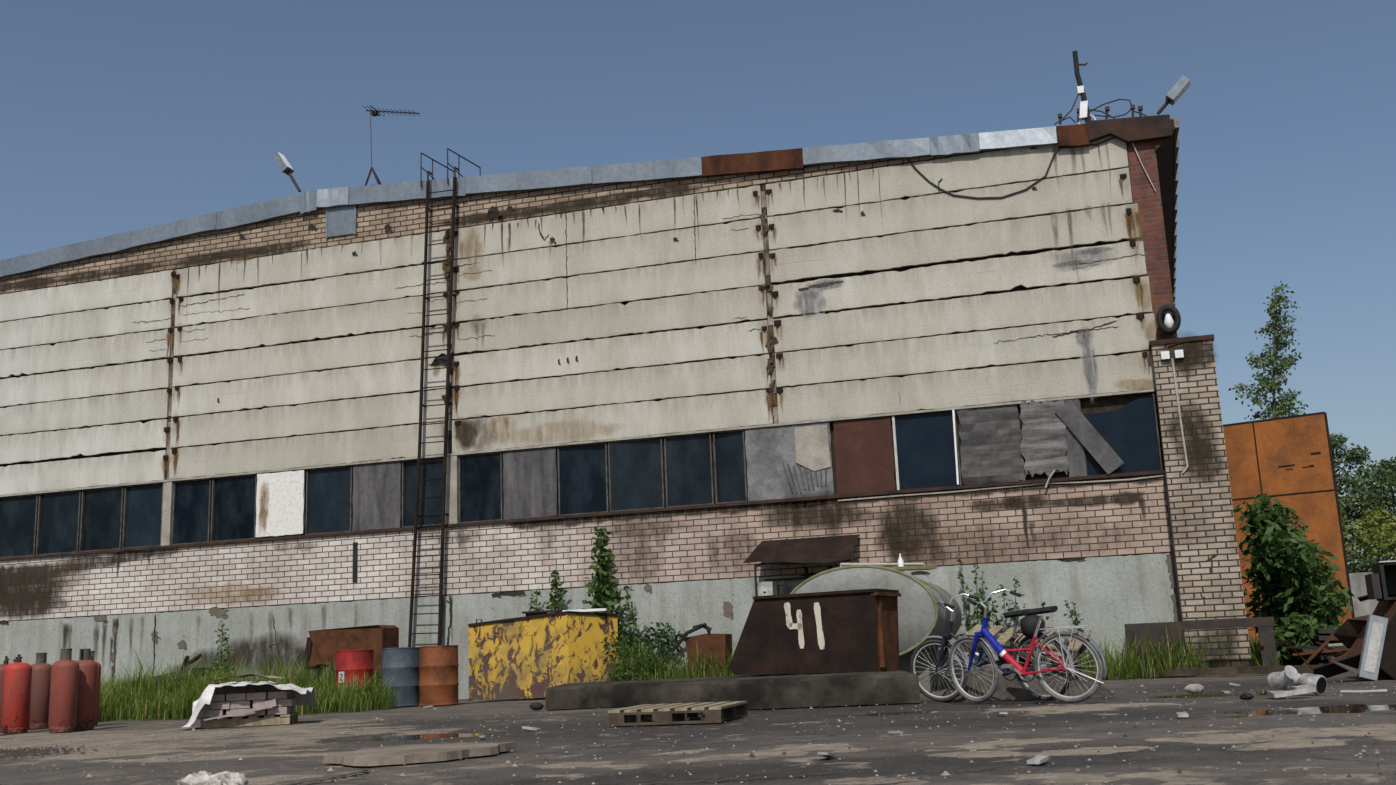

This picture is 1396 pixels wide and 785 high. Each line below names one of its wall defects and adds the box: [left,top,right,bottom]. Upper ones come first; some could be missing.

peeling [798,280,843,313]
leakage [1170,410,1222,480]
leakage [511,475,1160,554]
leakage [0,549,176,617]